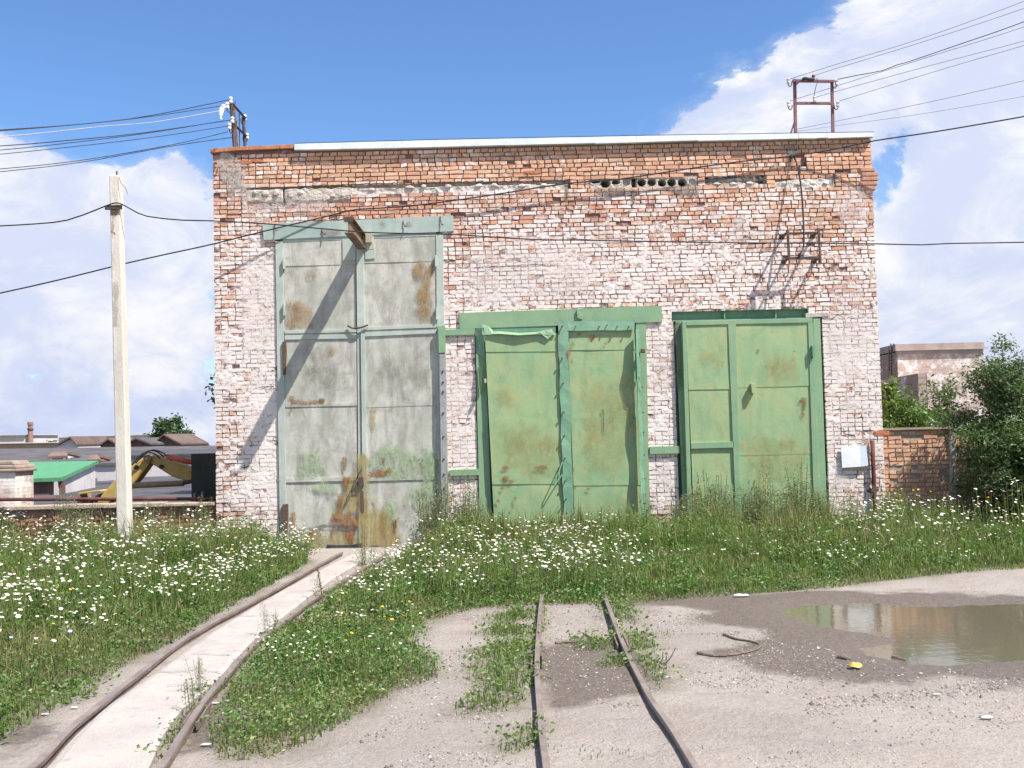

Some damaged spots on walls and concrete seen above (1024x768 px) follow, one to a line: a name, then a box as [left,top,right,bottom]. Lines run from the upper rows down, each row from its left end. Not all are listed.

spalling [246,170,570,204]
corrosion [291,457,358,545]